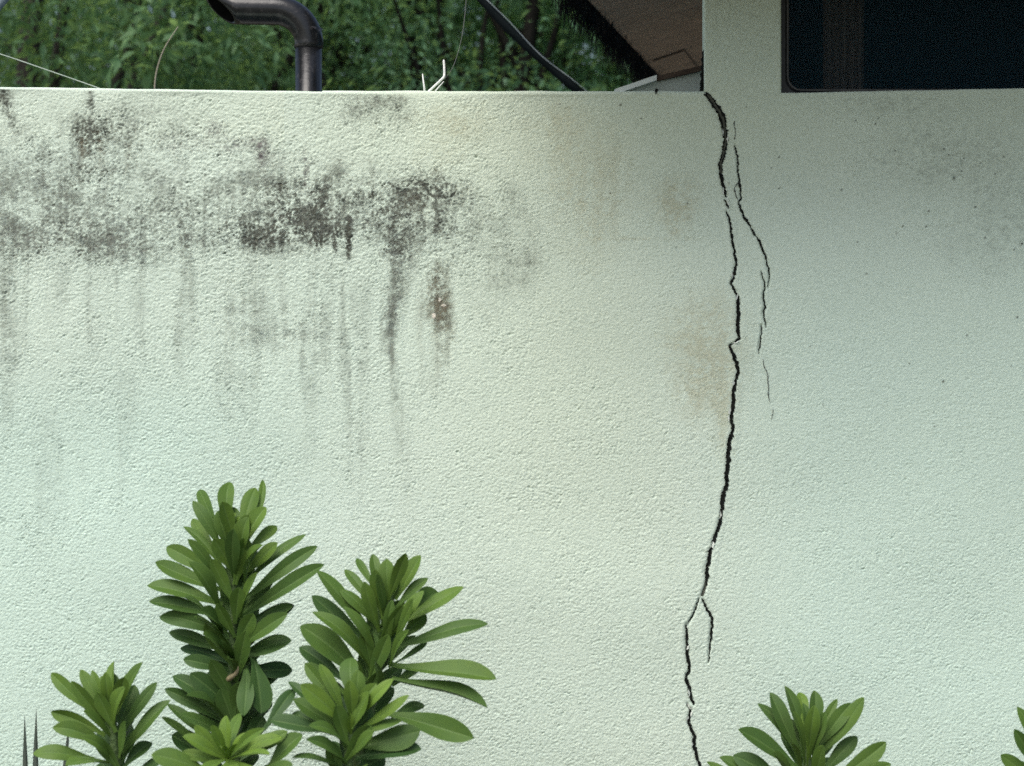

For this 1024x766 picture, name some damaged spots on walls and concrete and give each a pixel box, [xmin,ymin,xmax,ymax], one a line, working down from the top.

mould [72,91,126,152]
mould [0,151,153,261]
mould [148,171,456,258]
crack [684,49,774,766]